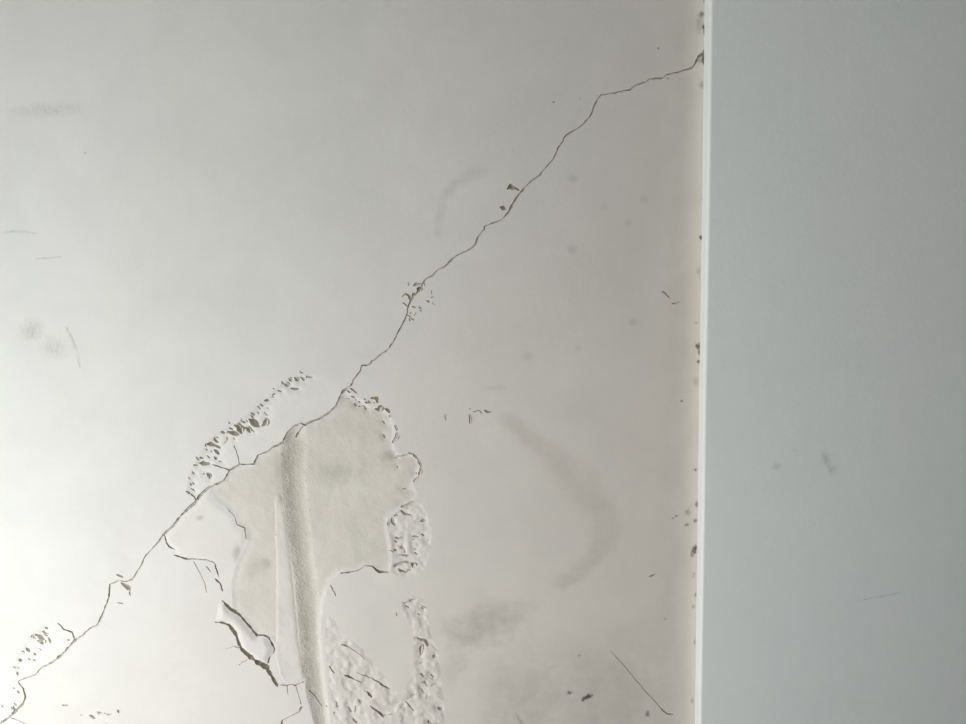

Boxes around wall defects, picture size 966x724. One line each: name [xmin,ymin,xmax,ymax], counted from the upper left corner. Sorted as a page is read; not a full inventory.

spalling [165,370,445,724]
crack [0,50,704,724]